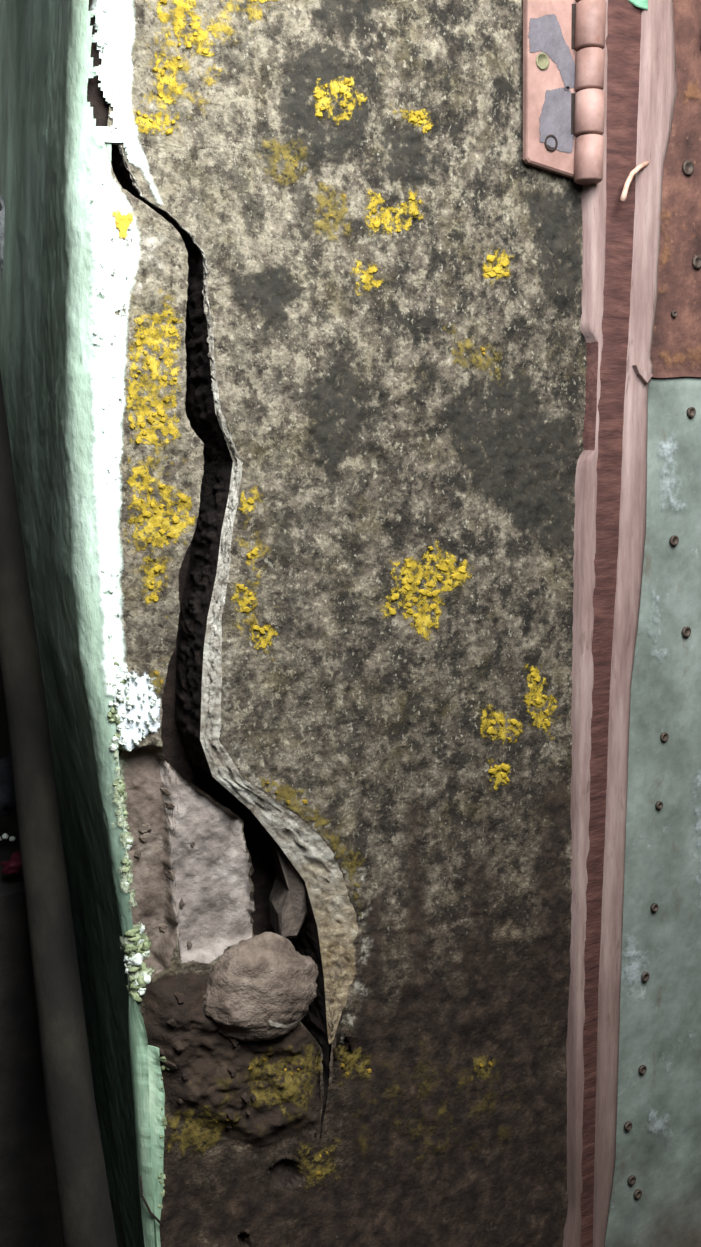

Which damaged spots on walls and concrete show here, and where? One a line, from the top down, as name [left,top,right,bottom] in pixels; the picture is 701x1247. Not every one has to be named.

leakage [113,671,160,752]
crack [87,0,368,1135]